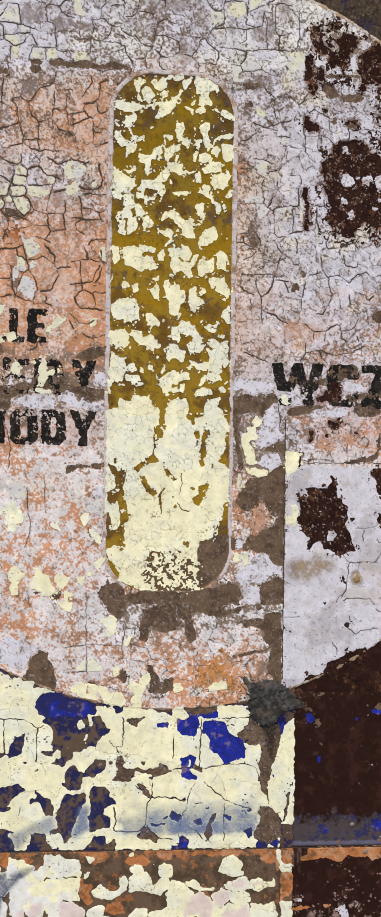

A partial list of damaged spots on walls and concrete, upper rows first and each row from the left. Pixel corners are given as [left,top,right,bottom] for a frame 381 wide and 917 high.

crack [0,0,381,363]
peeling [0,57,381,697]
peeling [0,644,381,917]